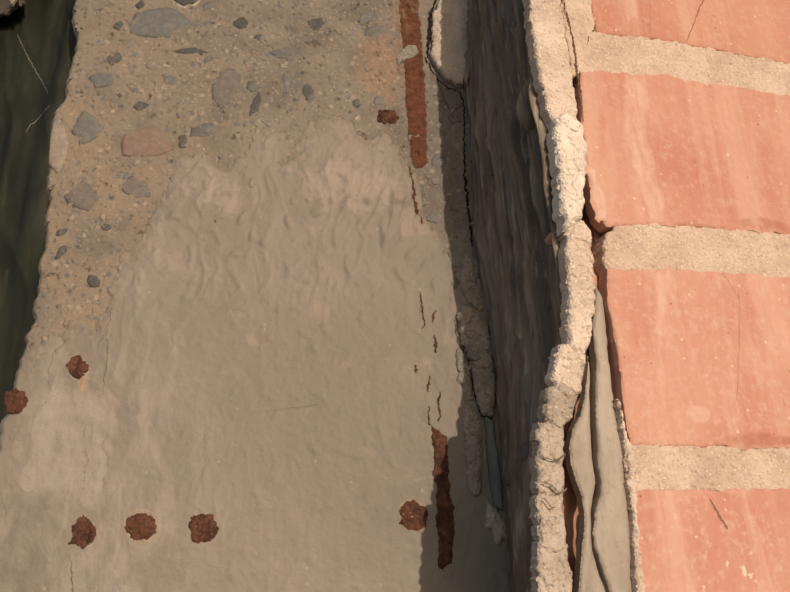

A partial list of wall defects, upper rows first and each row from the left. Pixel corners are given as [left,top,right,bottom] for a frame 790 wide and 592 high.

crack [686,0,704,42]
crack [563,0,595,121]
crack [425,0,473,247]
spalling [22,0,497,497]
rust [66,353,89,393]
peeling [529,286,632,592]
rust [68,514,98,549]
rust [121,509,162,545]
rust [188,513,220,544]
rust [398,499,430,532]
spalling [431,425,455,572]
spalling [484,502,507,545]